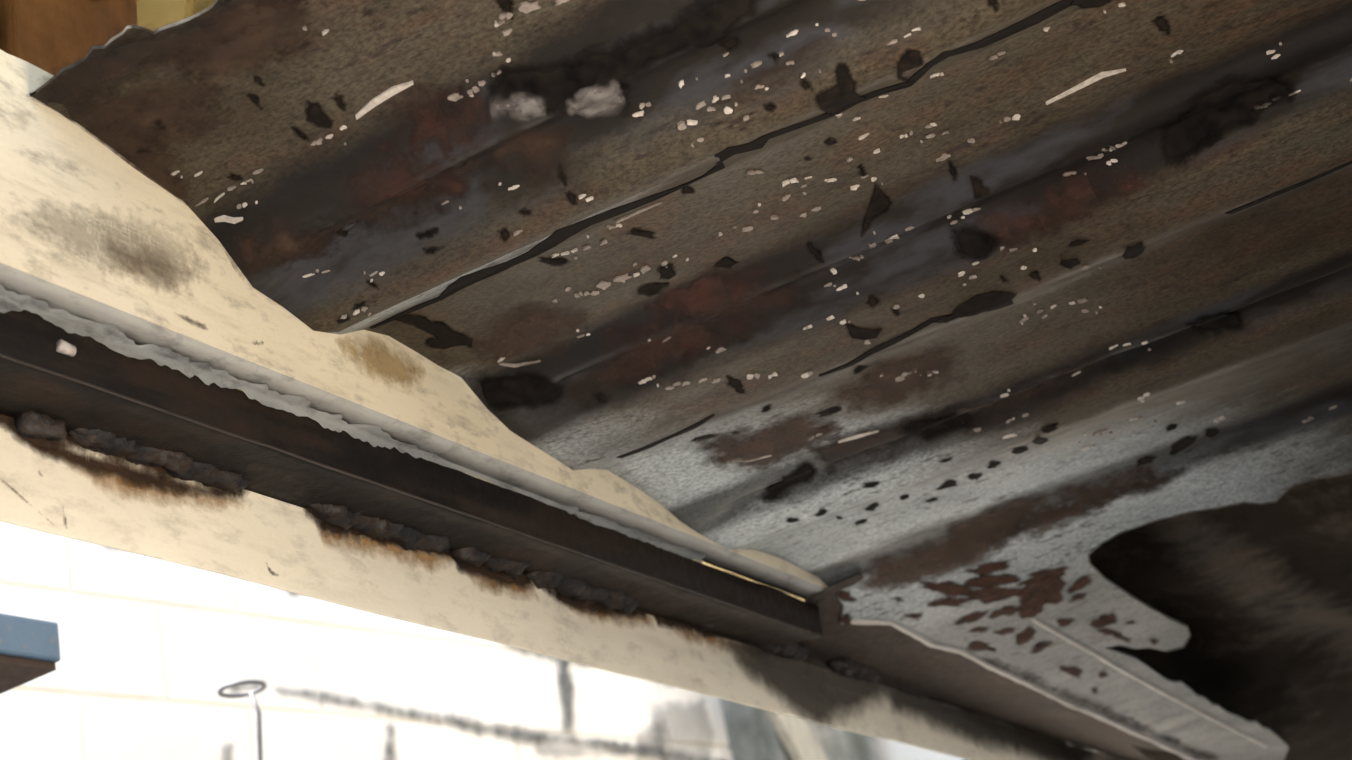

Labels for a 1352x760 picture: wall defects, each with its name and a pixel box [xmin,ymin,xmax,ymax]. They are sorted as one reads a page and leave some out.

spalling [291,81,414,146]
peeling [447,51,511,102]
peeling [677,95,749,147]
spalling [725,30,888,154]
peeling [1046,68,1126,105]
peeling [195,169,263,224]
spalling [719,157,914,261]
spalling [935,261,1102,325]
rust [701,350,1114,503]
spalling [925,413,1058,502]
spalling [815,481,879,526]
spalling [893,557,1091,654]